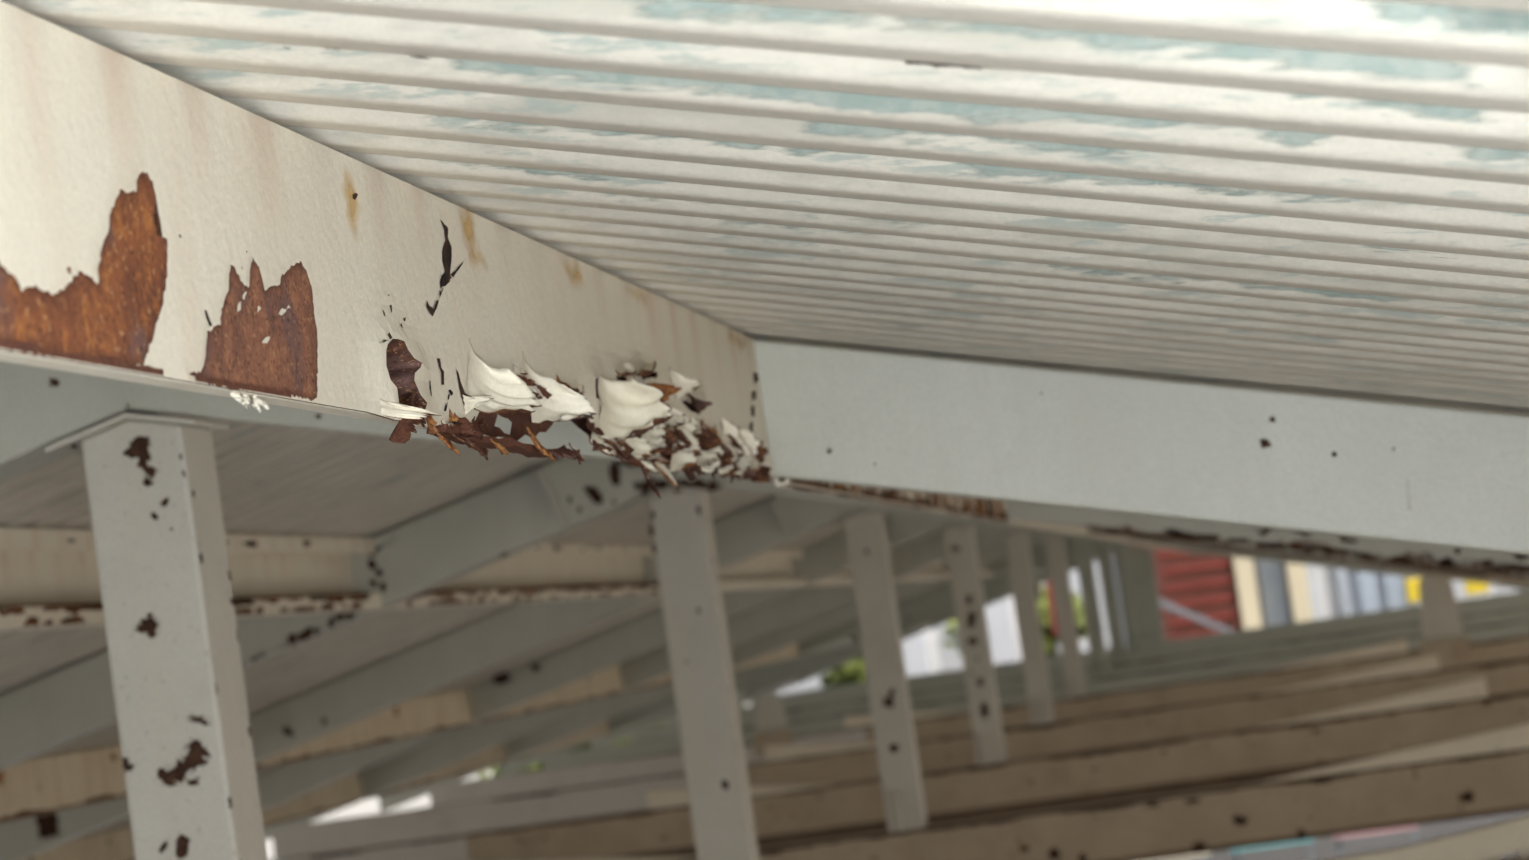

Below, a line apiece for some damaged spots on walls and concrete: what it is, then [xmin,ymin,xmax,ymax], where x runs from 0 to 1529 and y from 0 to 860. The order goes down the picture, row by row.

rust [0,167,181,376]
rust [187,251,321,419]
peeling [380,338,772,499]